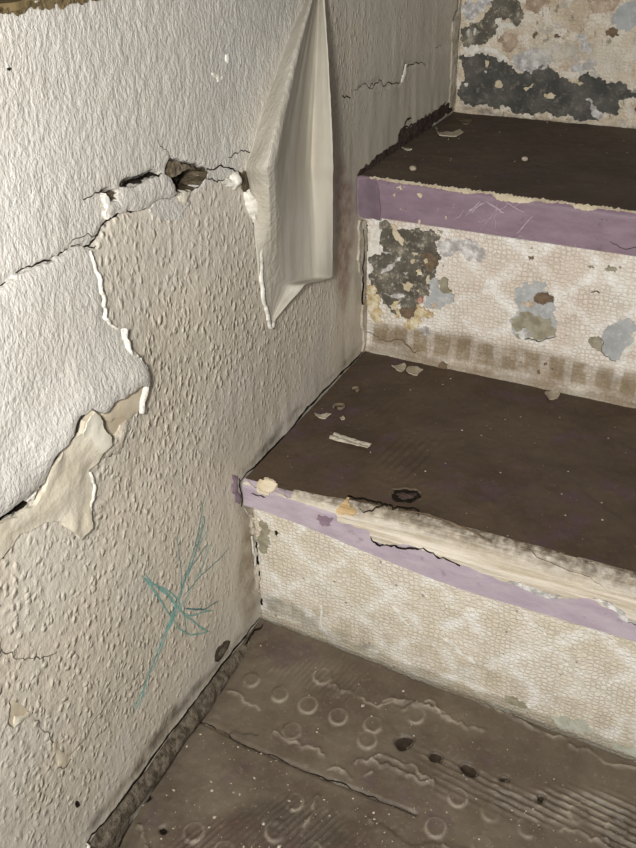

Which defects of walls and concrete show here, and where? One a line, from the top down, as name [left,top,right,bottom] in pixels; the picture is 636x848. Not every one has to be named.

spalling [0,0,98,16]
peeling [463,18,516,73]
crack [342,61,424,99]
peeling [586,98,602,120]
crack [0,208,146,288]
peeling [357,219,439,352]
peeling [391,363,423,376]
peeling [0,246,151,559]
peeling [545,388,561,400]
crack [371,538,460,567]
crack [520,546,602,586]